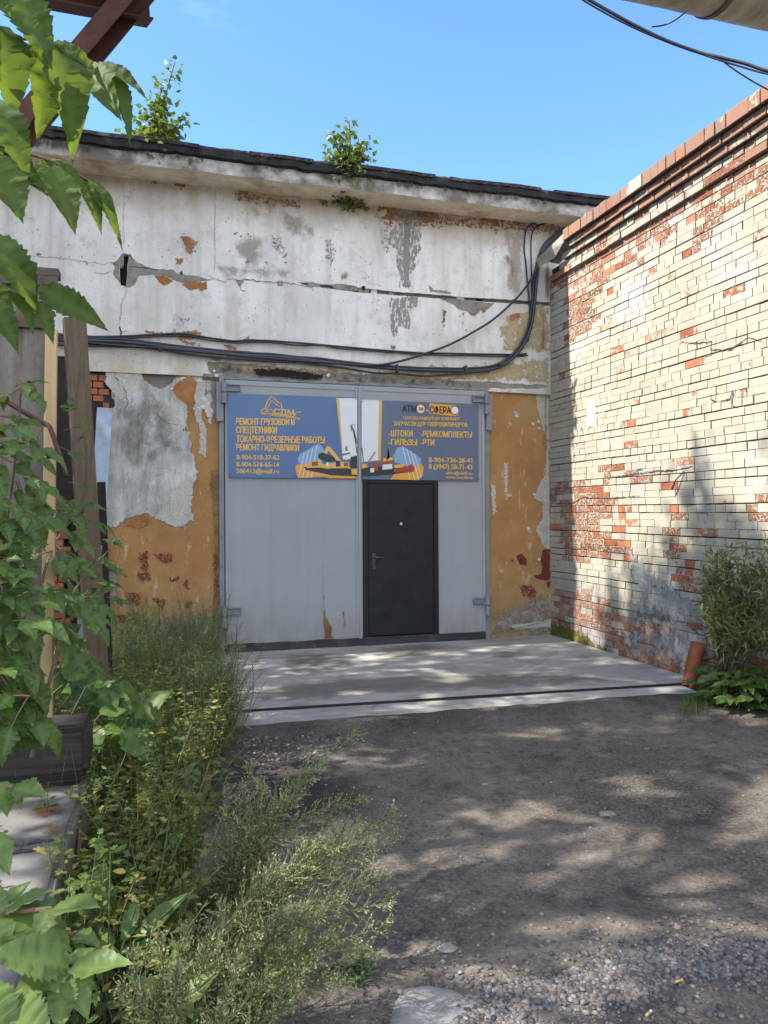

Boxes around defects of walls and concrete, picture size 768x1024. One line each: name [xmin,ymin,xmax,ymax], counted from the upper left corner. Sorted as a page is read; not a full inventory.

peeling [683,157,768,258]
spalling [95,233,214,291]
crack [208,265,314,291]
water stain [388,208,423,349]
peeling [563,209,677,346]
peeling [145,314,204,346]
peeling [90,336,651,612]
peeling [663,513,706,592]
rust [324,612,332,639]
peeling [554,589,679,674]